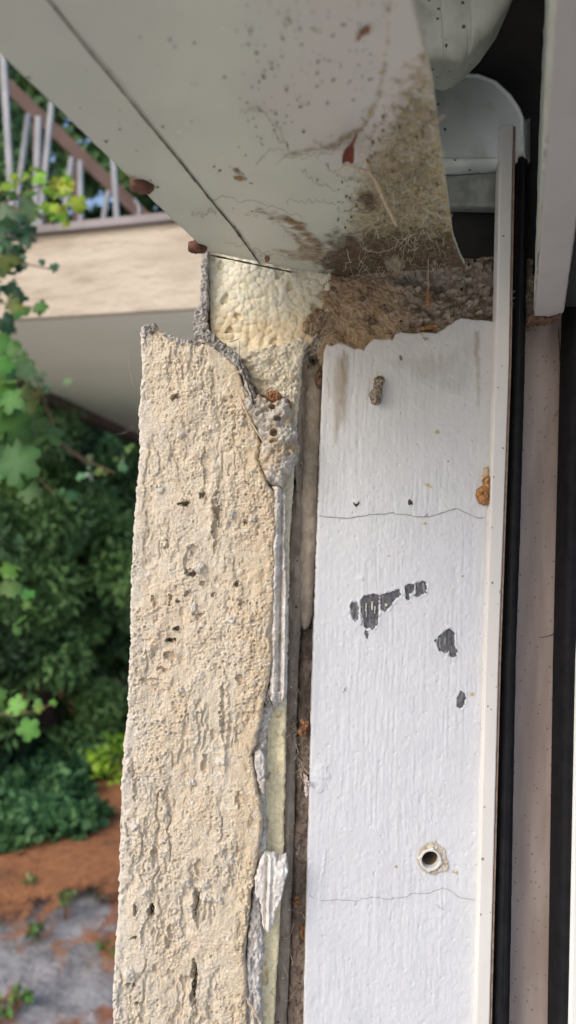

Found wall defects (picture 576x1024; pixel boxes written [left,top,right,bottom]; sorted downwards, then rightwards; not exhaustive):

spalling [512,259,535,332]
spalling [140,257,494,489]
peeling [350,580,427,639]
peeling [434,628,458,657]
peeling [457,691,466,708]
spalling [246,687,288,1024]